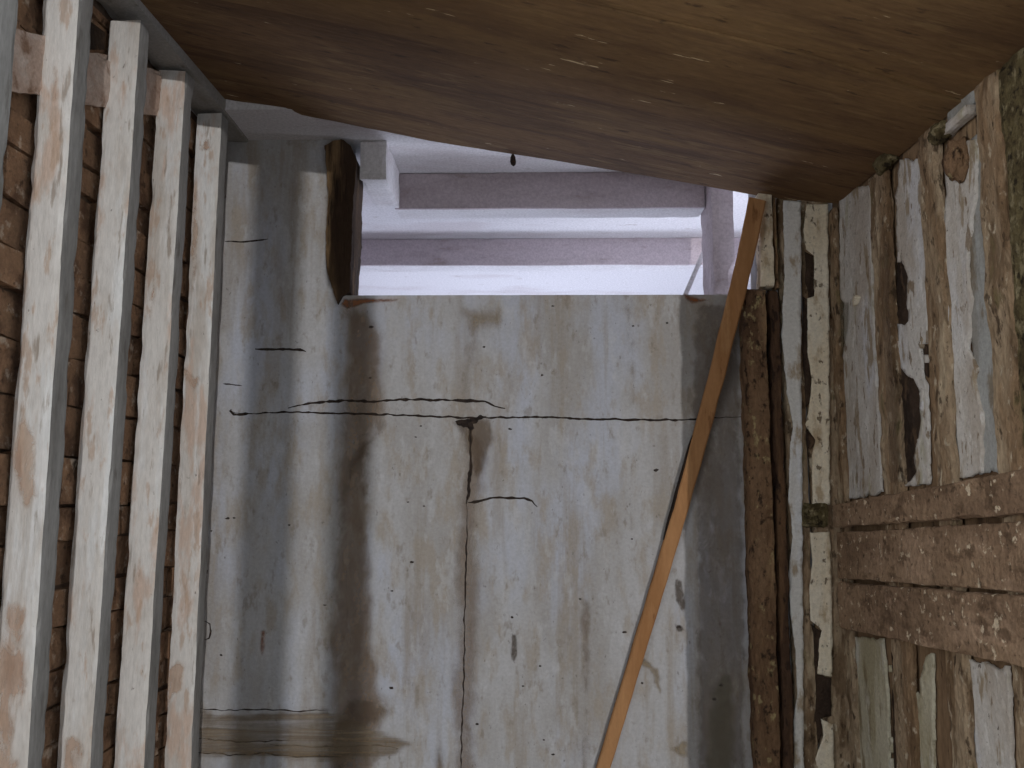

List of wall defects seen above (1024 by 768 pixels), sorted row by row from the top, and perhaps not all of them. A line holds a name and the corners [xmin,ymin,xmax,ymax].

crack [225,237,267,245]
crack [256,346,306,354]
water stain [200,312,406,768]
crack [198,383,734,765]
flaking render [781,185,884,768]
flaking render [855,636,897,768]
flaking render [895,158,932,486]
flaking render [916,653,937,768]
flaking render [943,135,998,478]
flaking render [969,659,1015,768]